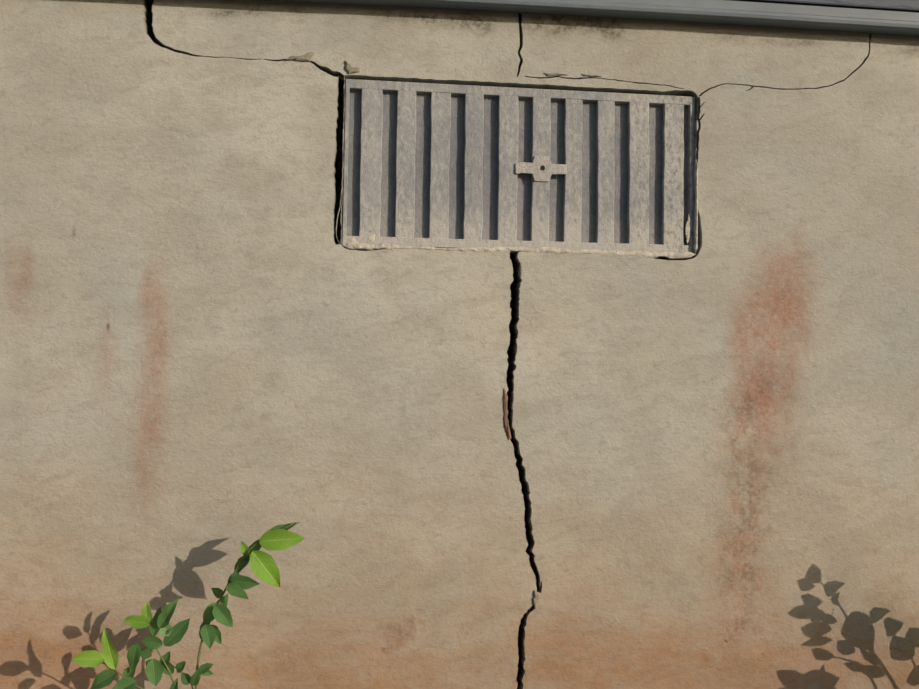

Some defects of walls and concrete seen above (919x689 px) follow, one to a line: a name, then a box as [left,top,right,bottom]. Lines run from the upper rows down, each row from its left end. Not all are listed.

crack [143,0,360,245]
crack [517,13,871,164]
crack [503,251,542,689]
rust [696,209,837,656]